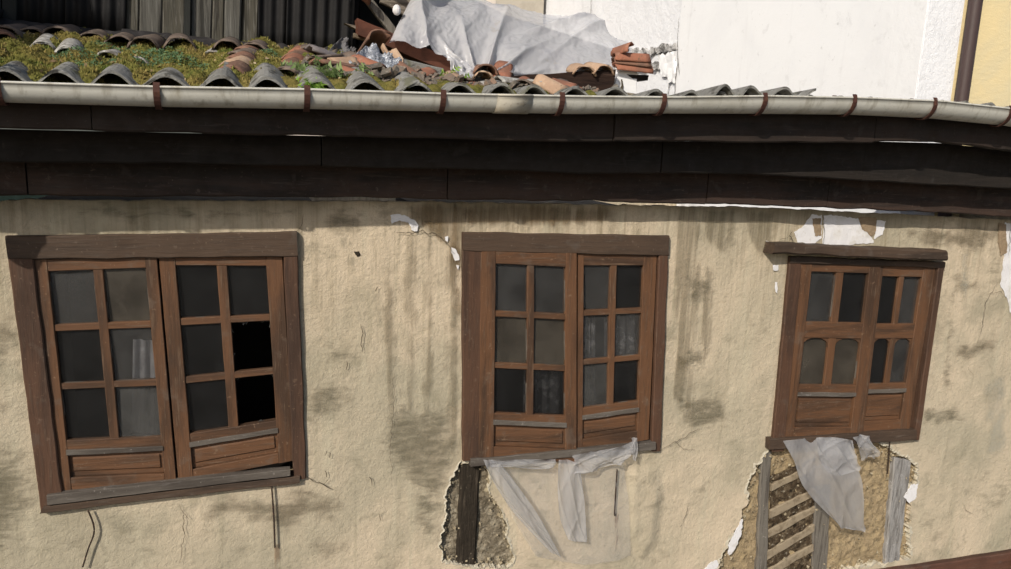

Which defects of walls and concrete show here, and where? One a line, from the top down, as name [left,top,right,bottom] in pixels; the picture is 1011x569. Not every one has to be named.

flaking render [390,214,419,231]
flaking render [794,214,886,245]
flaking render [998,222,1011,313]
flaking render [438,461,516,569]
flaking render [704,442,920,569]